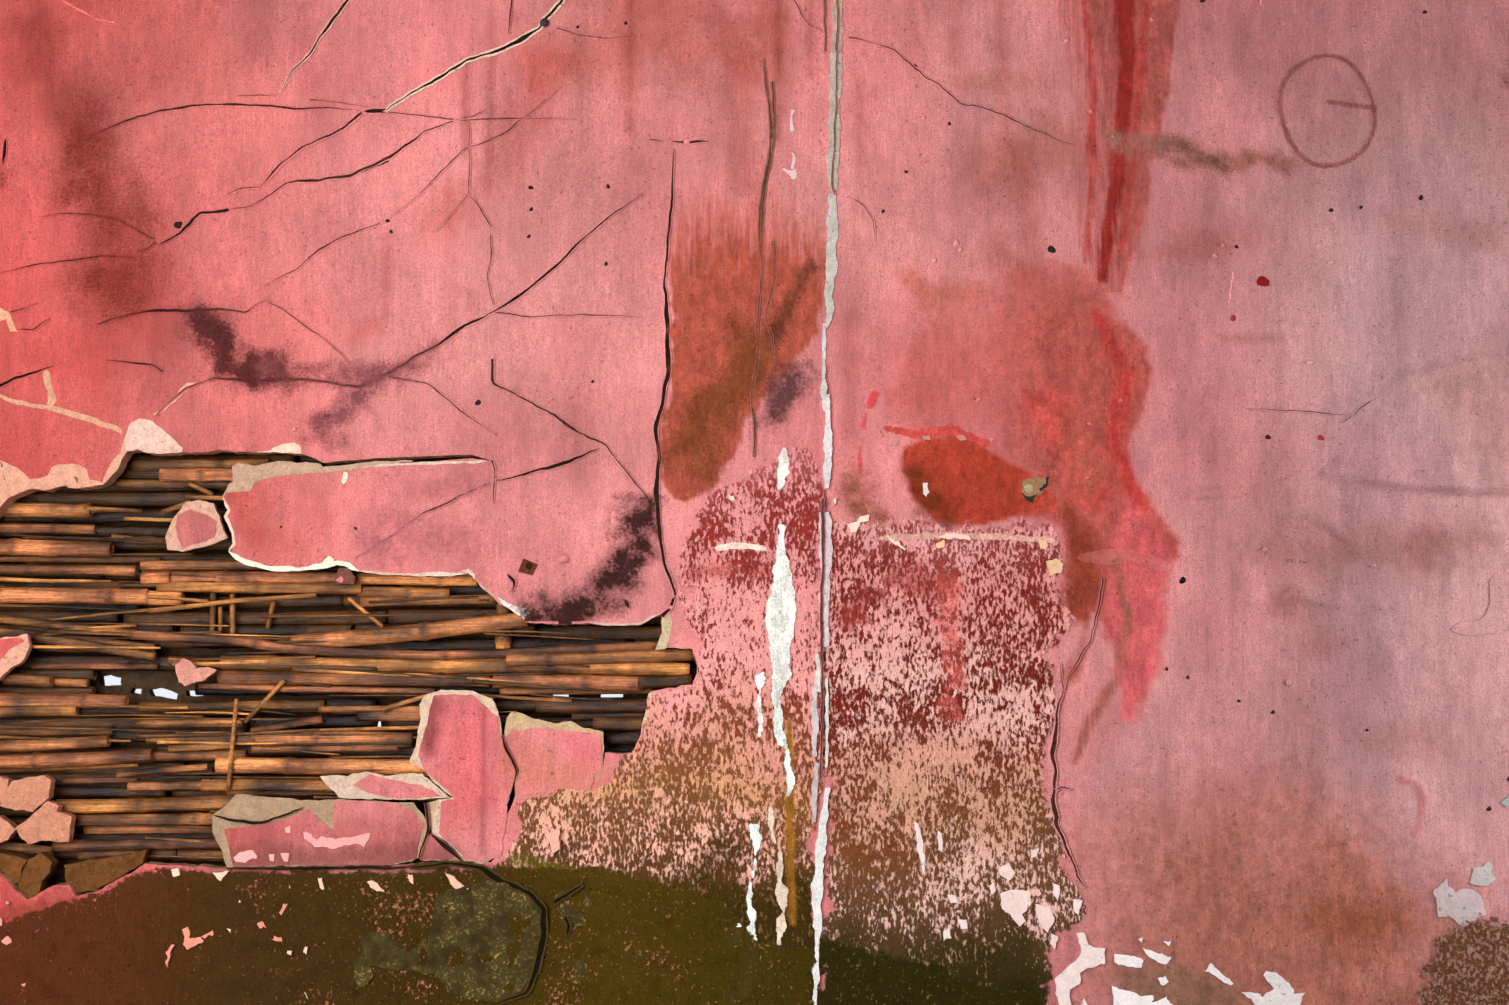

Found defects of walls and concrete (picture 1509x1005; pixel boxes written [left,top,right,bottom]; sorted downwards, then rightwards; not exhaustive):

crack [0,0,709,618]
damp [1003,0,1295,764]
flaking render [165,442,531,622]
crack [792,0,1074,1005]
flaking render [175,658,217,686]
peeling [212,850,290,881]
crack [213,807,304,825]
crack [228,802,584,1005]
crack [501,734,518,782]
peeling [989,863,1173,1005]
peeling [1206,963,1305,1005]
peeling [1433,862,1496,927]